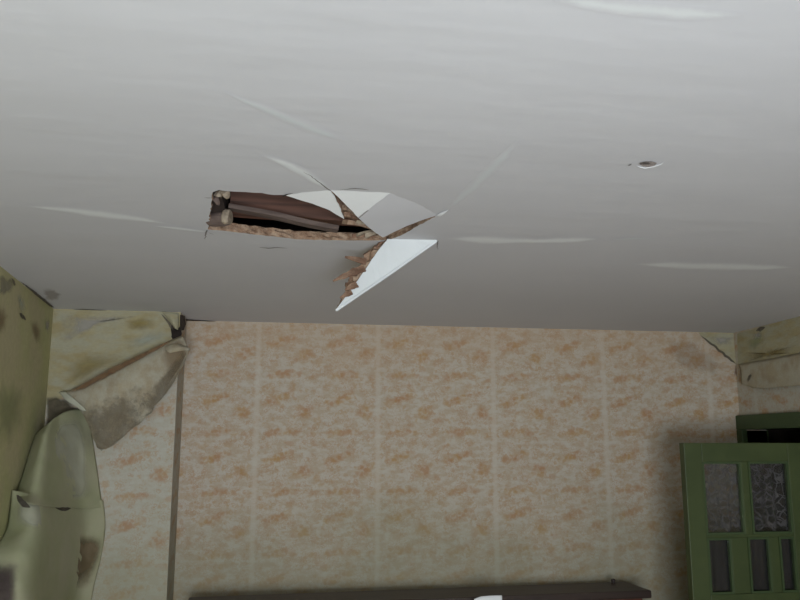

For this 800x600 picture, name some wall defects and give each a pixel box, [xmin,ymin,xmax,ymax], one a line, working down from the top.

spalling [628,161,664,169]
spalling [208,194,435,241]
flaking render [46,309,181,404]
flaking render [737,316,800,365]